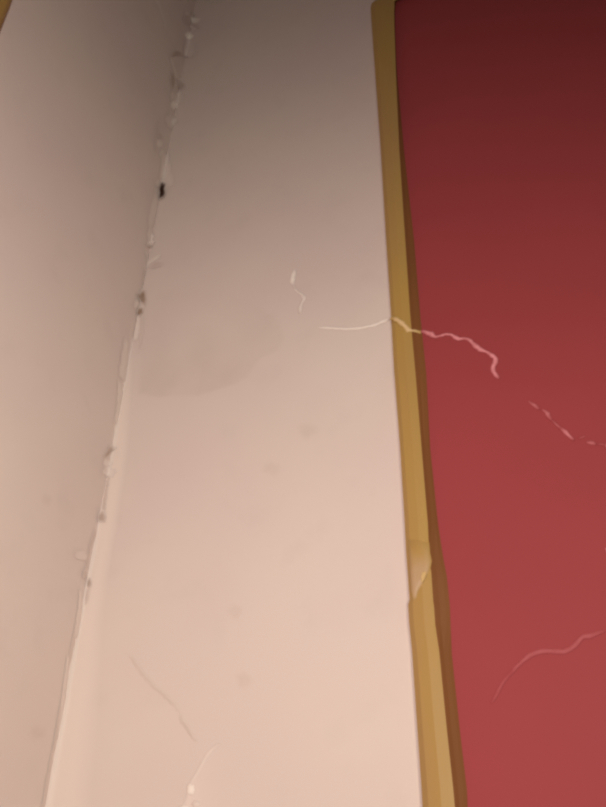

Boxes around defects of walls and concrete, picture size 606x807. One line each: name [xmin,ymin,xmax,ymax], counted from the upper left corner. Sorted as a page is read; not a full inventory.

crack [114,10,202,424]
crack [318,316,500,380]
crack [528,400,606,448]
peeling [409,540,432,601]
crack [42,445,117,807]
crack [490,629,606,704]